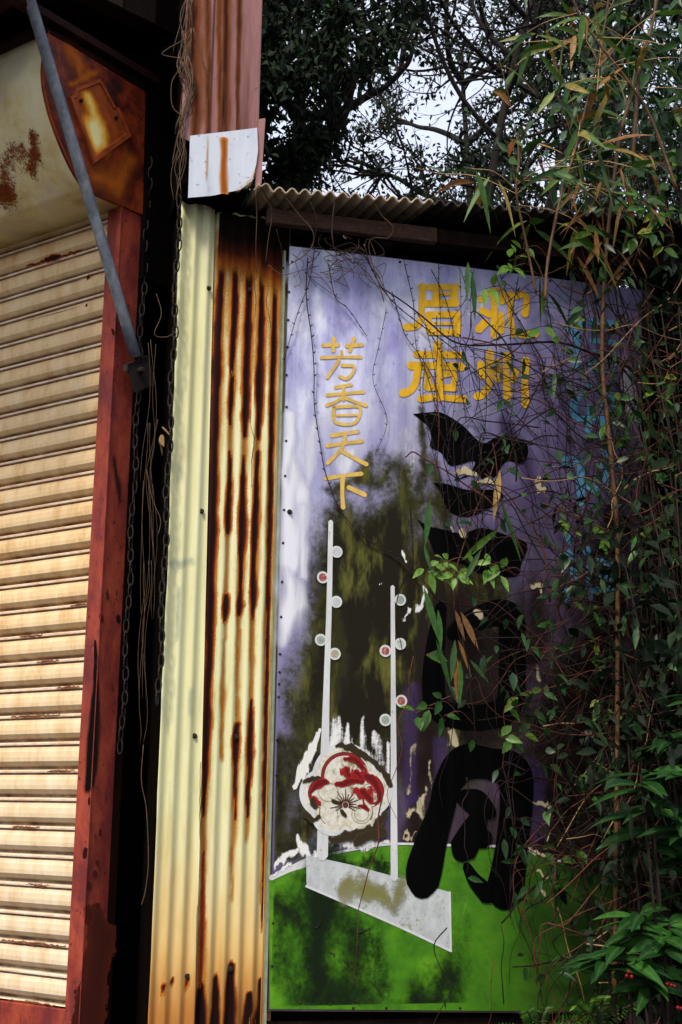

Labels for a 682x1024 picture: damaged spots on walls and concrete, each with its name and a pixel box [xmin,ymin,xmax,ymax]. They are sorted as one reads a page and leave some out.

rust [64,36,98,86]
rust [186,0,242,194]
rust [0,128,44,216]
rust [90,155,136,197]
rust [160,213,290,1024]